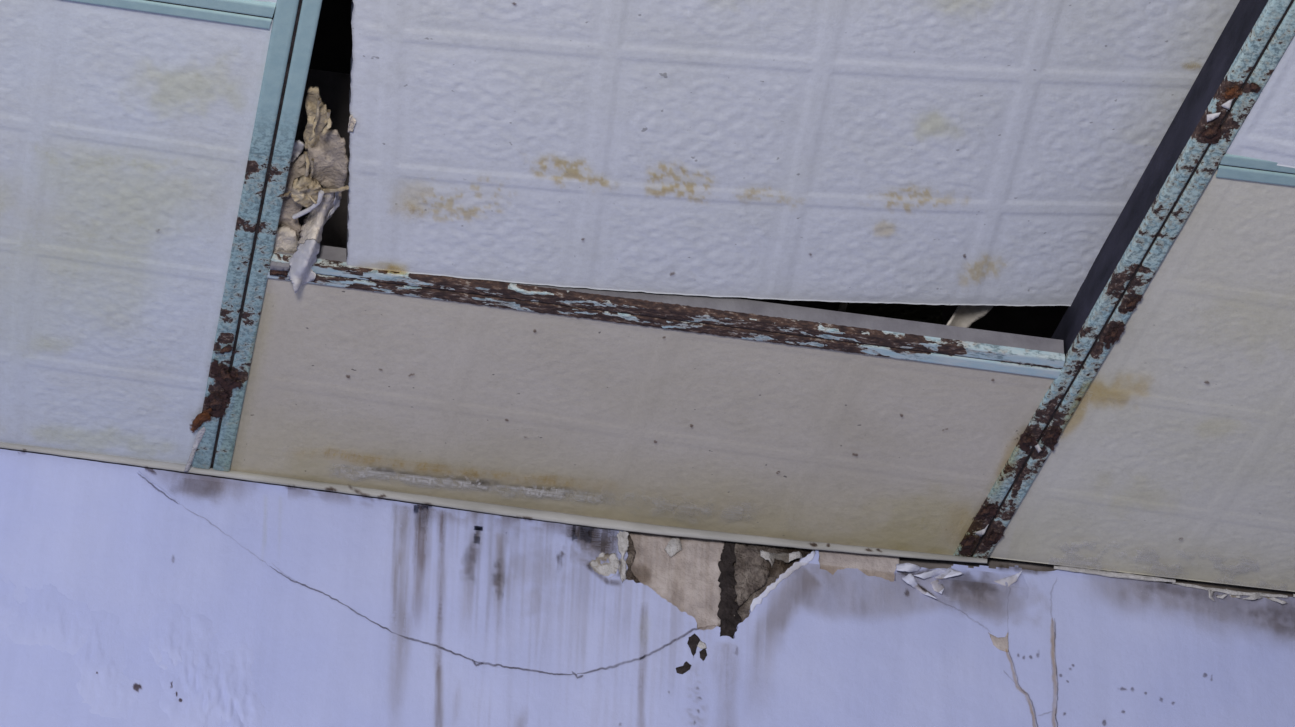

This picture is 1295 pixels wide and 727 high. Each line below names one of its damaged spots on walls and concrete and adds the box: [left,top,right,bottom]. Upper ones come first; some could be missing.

corrosion [1221,81,1261,100]
corrosion [1201,123,1221,145]
corrosion [1101,295,1143,350]
corrosion [190,344,243,433]
corrosion [1015,428,1062,452]
crack [137,471,179,504]
corrosion [958,503,1004,556]
flaking render [588,530,963,674]
crack [988,632,1009,652]